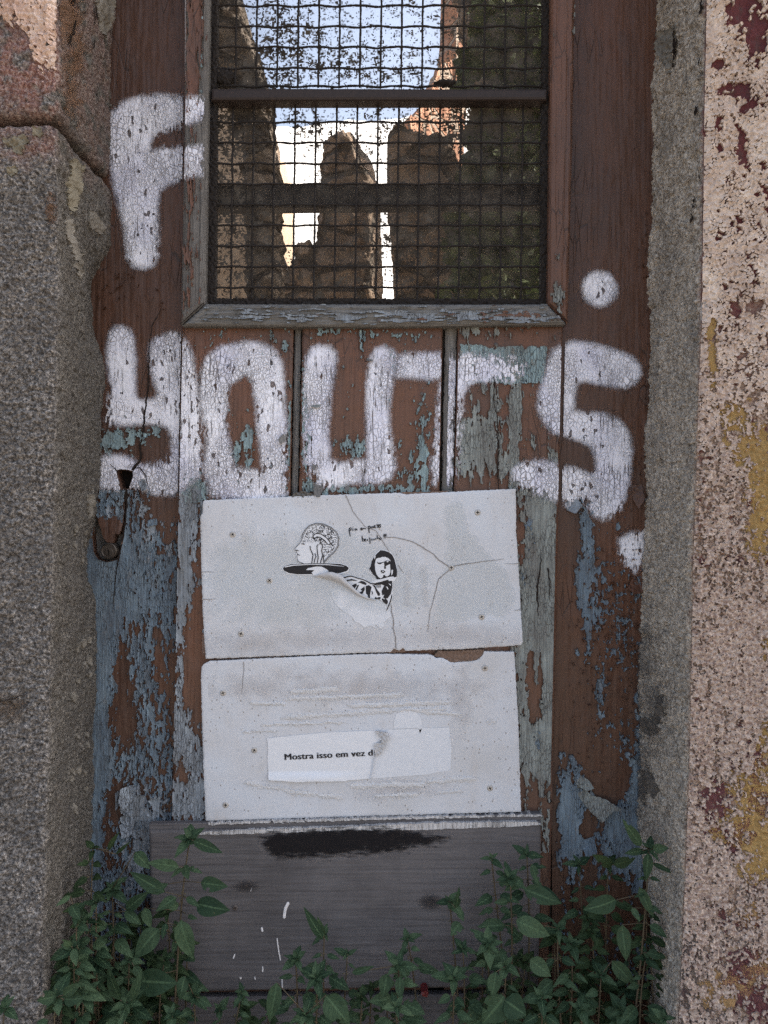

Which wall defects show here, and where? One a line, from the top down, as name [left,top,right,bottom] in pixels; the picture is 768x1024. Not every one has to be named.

peeling [0,0,76,74]
peeling [93,0,116,49]
peeling [185,0,207,143]
peeling [68,164,651,989]
crack [346,496,501,632]
peeling [679,0,768,1024]